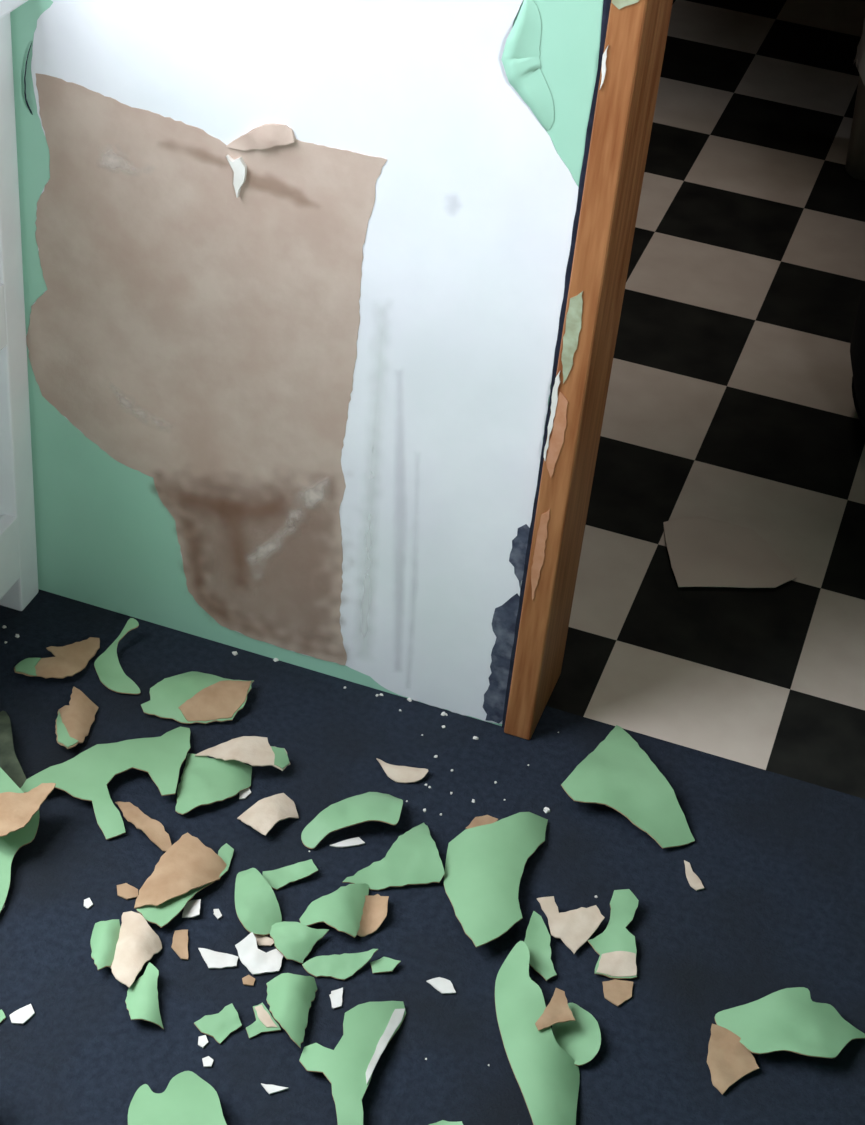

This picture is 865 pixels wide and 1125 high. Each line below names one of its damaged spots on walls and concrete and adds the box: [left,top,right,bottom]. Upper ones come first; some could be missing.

peeling [22,0,579,724]